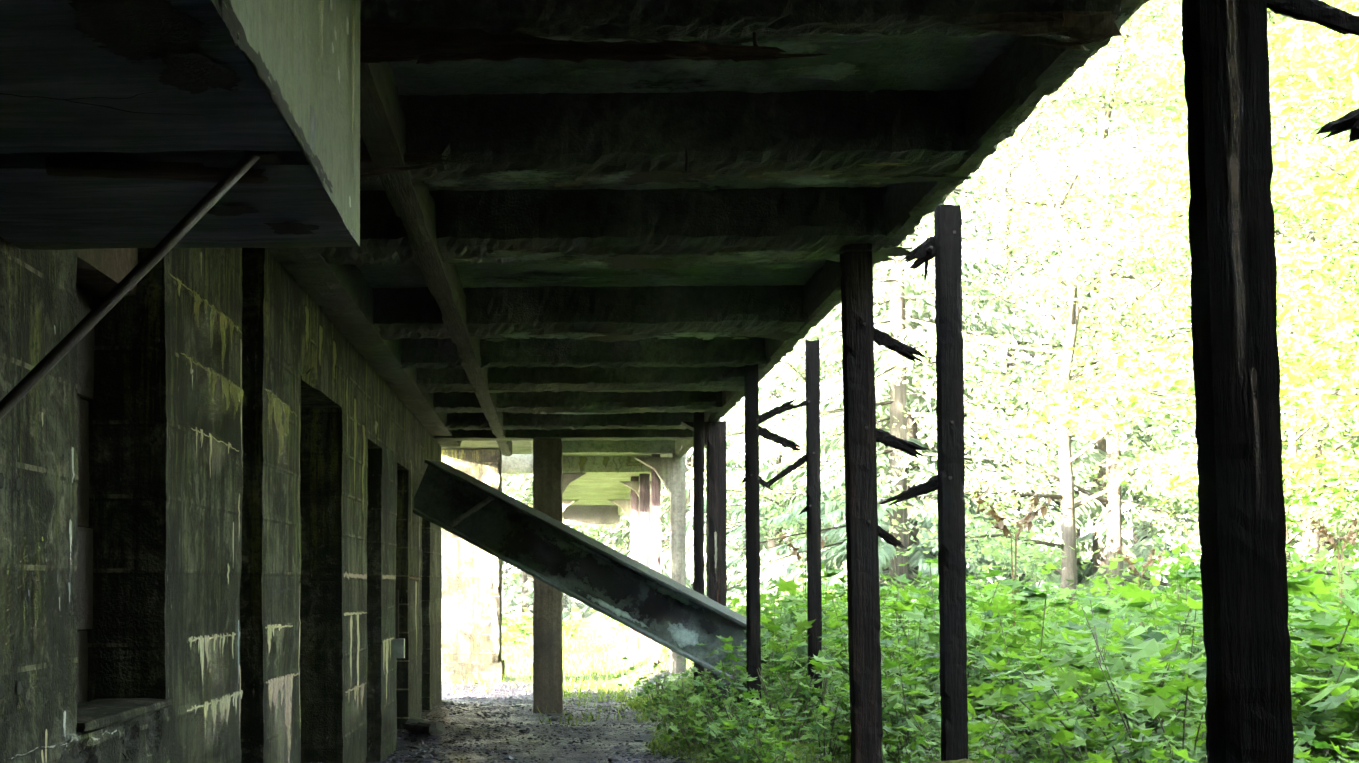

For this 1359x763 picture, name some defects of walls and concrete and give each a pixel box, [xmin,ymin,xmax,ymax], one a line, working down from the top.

leakage [265,590,301,654]
leakage [187,620,243,729]
leakage [266,670,301,763]